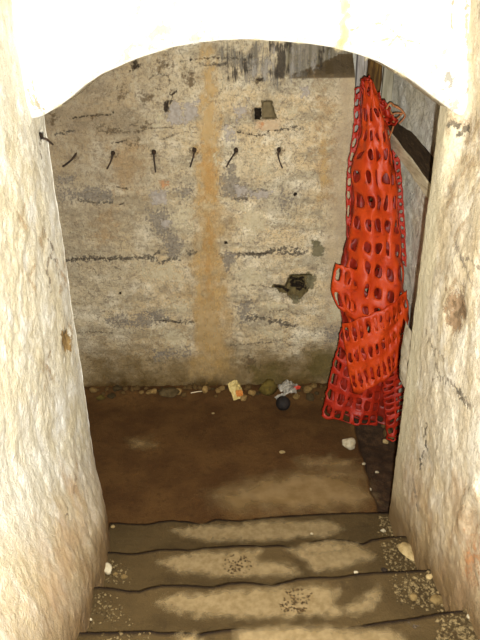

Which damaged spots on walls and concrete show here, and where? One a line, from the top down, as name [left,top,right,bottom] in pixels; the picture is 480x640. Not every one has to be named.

leakage [221,40,306,88]
spalling [233,100,298,131]
spalling [271,272,316,304]